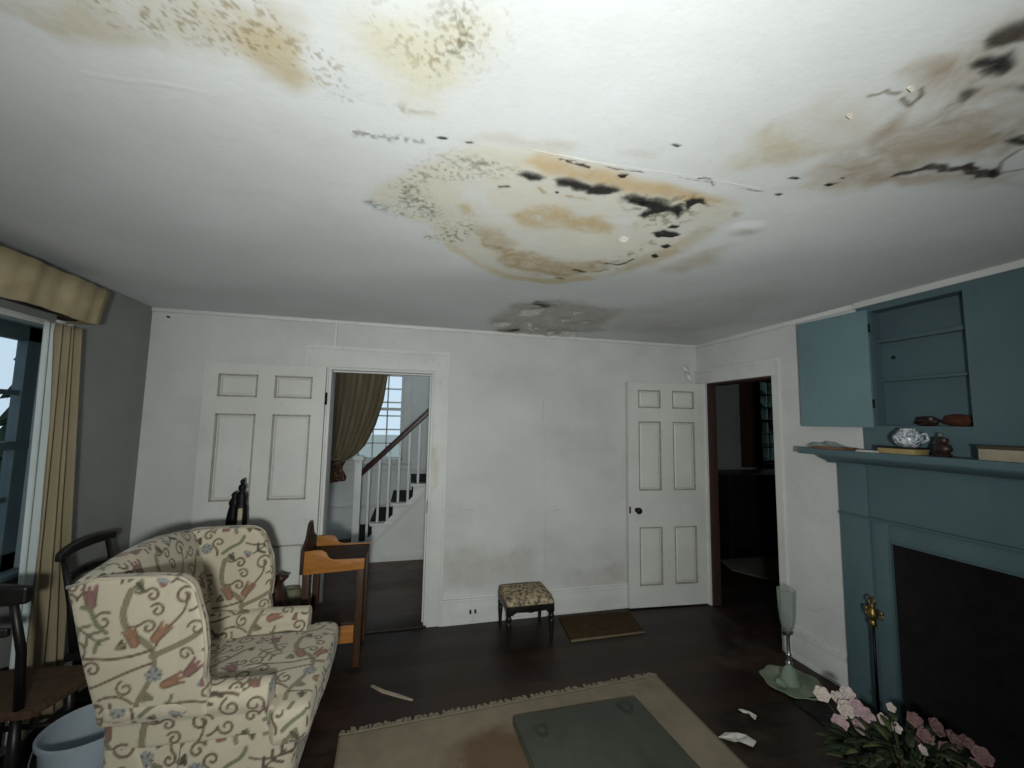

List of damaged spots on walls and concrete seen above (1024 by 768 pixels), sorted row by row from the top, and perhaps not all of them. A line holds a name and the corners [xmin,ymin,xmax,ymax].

leakage [975,22,1024,74]
leakage [521,172,542,180]
leakage [556,174,705,258]
peeling [493,304,586,337]